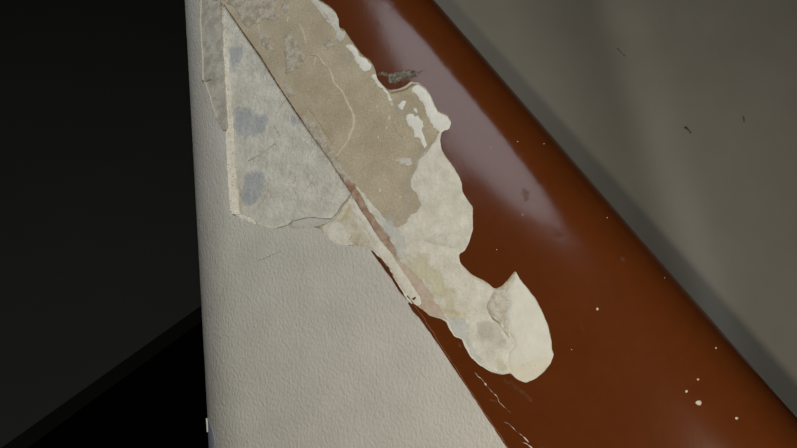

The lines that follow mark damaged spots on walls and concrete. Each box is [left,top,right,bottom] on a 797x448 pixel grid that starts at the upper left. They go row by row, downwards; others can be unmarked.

peeling [199,0,554,383]
crack [371,250,532,448]